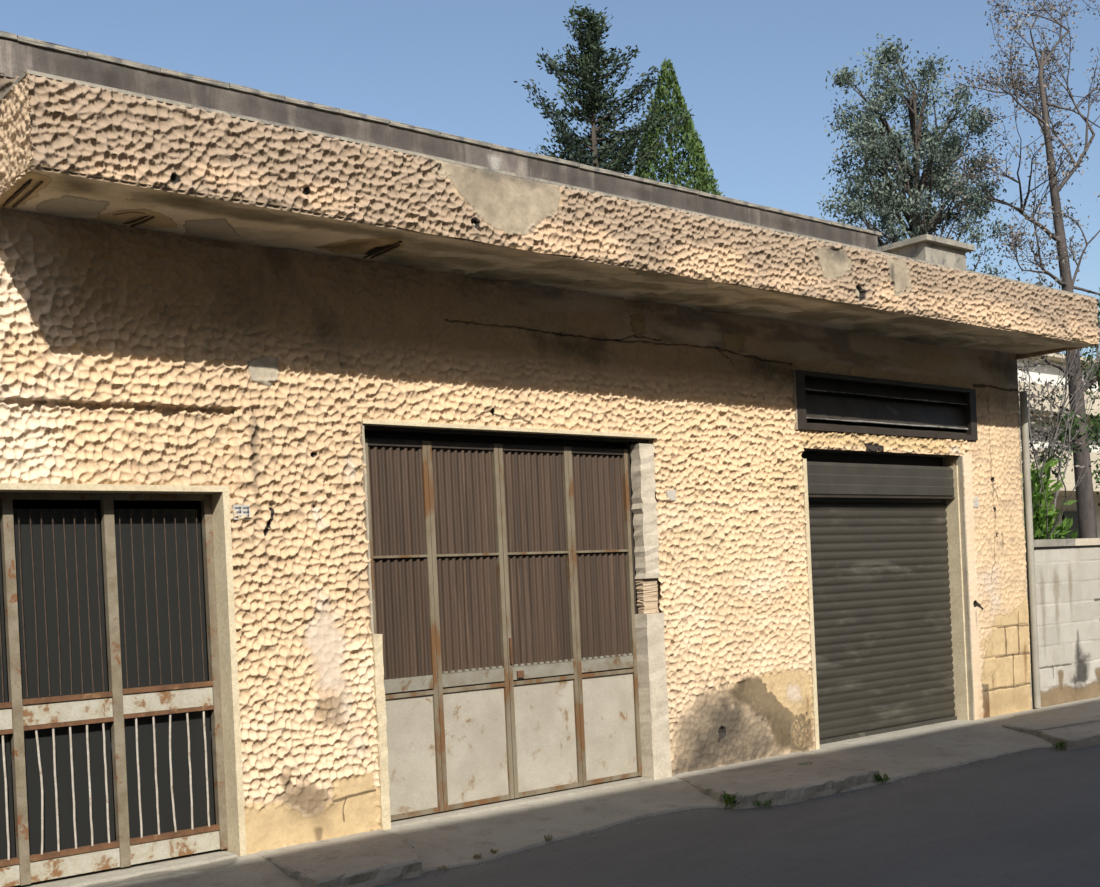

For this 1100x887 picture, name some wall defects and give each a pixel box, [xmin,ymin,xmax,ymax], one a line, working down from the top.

peeling [422,156,560,236]
crack [445,319,792,365]
peeling [305,588,354,719]
rust [0,681,213,708]
rust [0,705,214,735]
damp [685,702,778,756]
peeling [244,774,381,854]
rust [0,824,220,867]